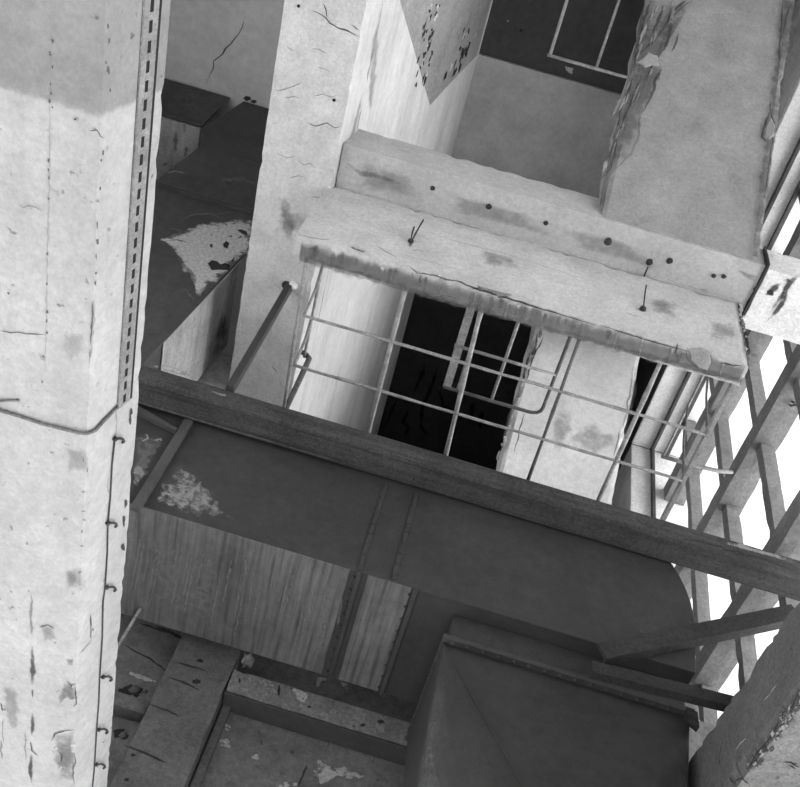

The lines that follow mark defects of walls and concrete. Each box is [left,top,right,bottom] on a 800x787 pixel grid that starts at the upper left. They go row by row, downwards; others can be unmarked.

crack [206,21,244,83]
crack [314,3,358,35]
peeling [400,0,491,105]
spalling [600,0,690,206]
peeling [161,211,252,300]
spalling [496,329,543,460]
peeling [52,730,76,785]
peeling [57,683,79,706]
peeling [313,760,364,784]
spalling [747,689,800,771]